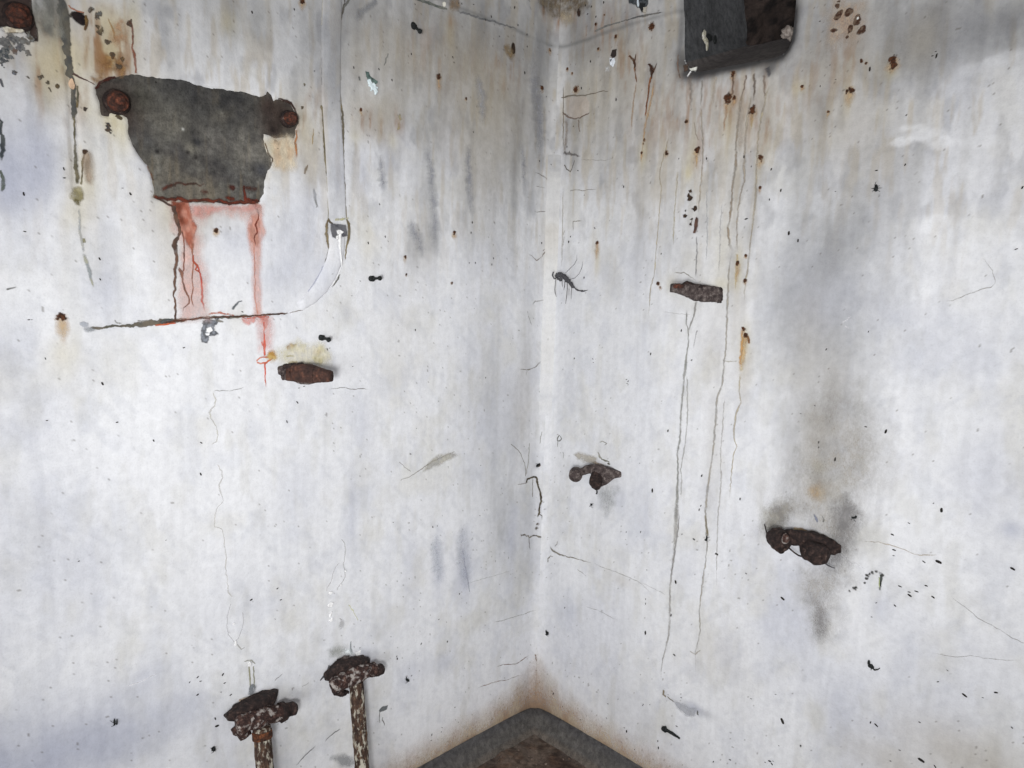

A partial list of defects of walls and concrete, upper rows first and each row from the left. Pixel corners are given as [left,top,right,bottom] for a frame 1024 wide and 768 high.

rust [830,0,866,39]
peeling [88,7,304,207]
crack [80,310,301,331]
rust [172,202,216,320]
rust [229,203,334,385]
rust [656,281,723,303]